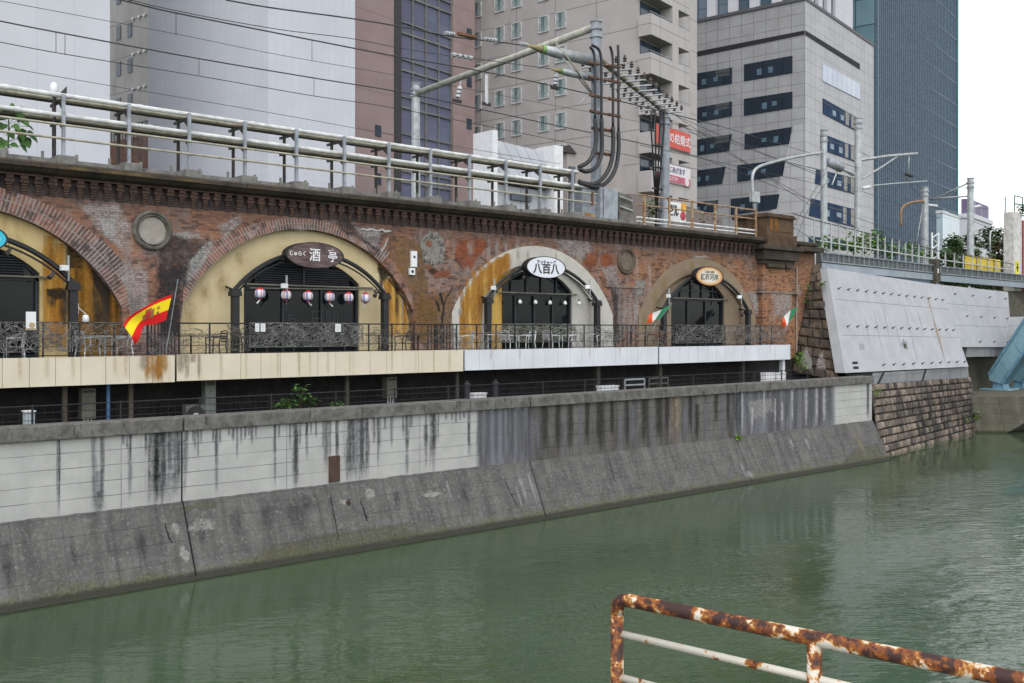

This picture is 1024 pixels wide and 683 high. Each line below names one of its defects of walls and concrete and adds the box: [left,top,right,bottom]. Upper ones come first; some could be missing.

corrosion [43,236,120,357]
corrosion [393,242,514,350]
corrosion [141,354,200,377]
leakage [93,437,104,510]
leakage [274,415,412,473]
leakage [425,386,834,466]